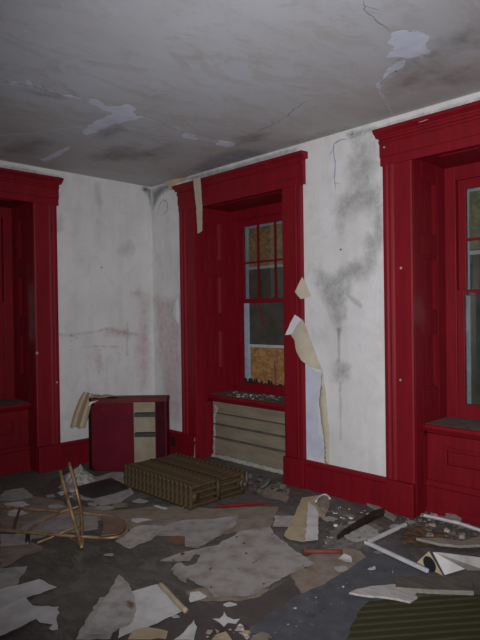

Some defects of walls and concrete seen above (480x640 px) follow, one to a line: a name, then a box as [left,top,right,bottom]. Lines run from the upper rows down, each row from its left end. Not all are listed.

crack [363,1,391,33]
peeling [376,30,431,88]
peeling [82,99,143,135]
crack [329,138,348,190]
peeling [285,315,301,335]
flaking render [305,366,325,459]
water stain [319,371,330,464]